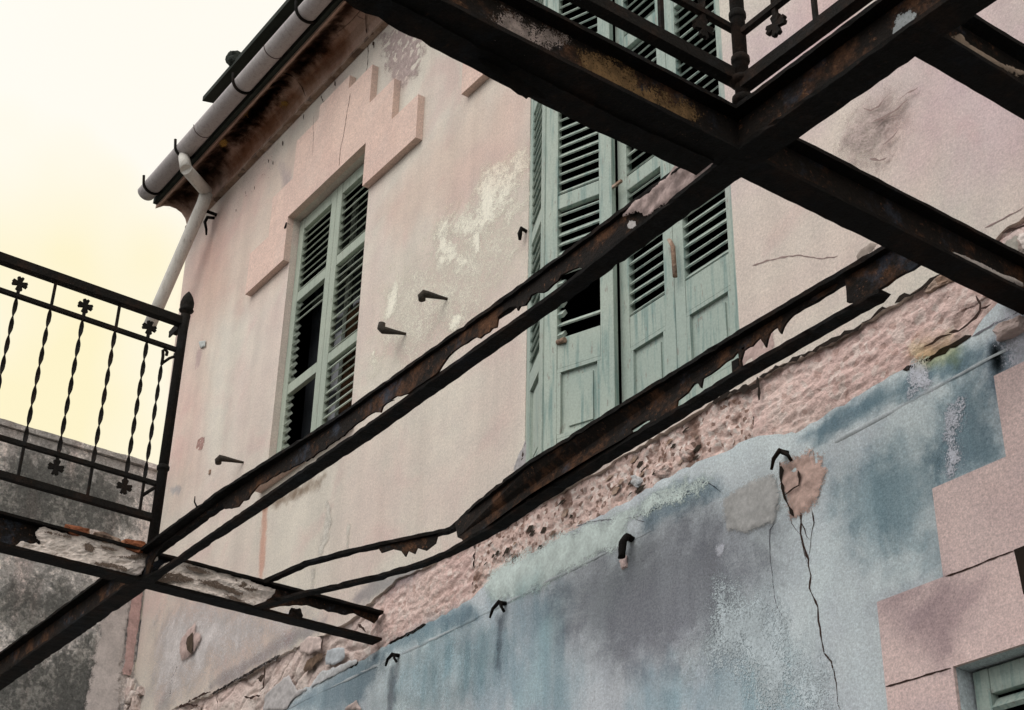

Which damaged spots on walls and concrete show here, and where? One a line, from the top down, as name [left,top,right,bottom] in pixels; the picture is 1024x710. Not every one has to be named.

leakage [164,3,353,204]
corrosion [574,45,704,124]
crack [752,255,837,266]
spalling [999,222,1024,254]
spalling [173,275,997,710]
efflorescence [904,354,934,400]
efflorescence [936,396,971,479]
leakage [362,471,715,710]
leakage [681,542,850,710]
crack [769,512,841,710]